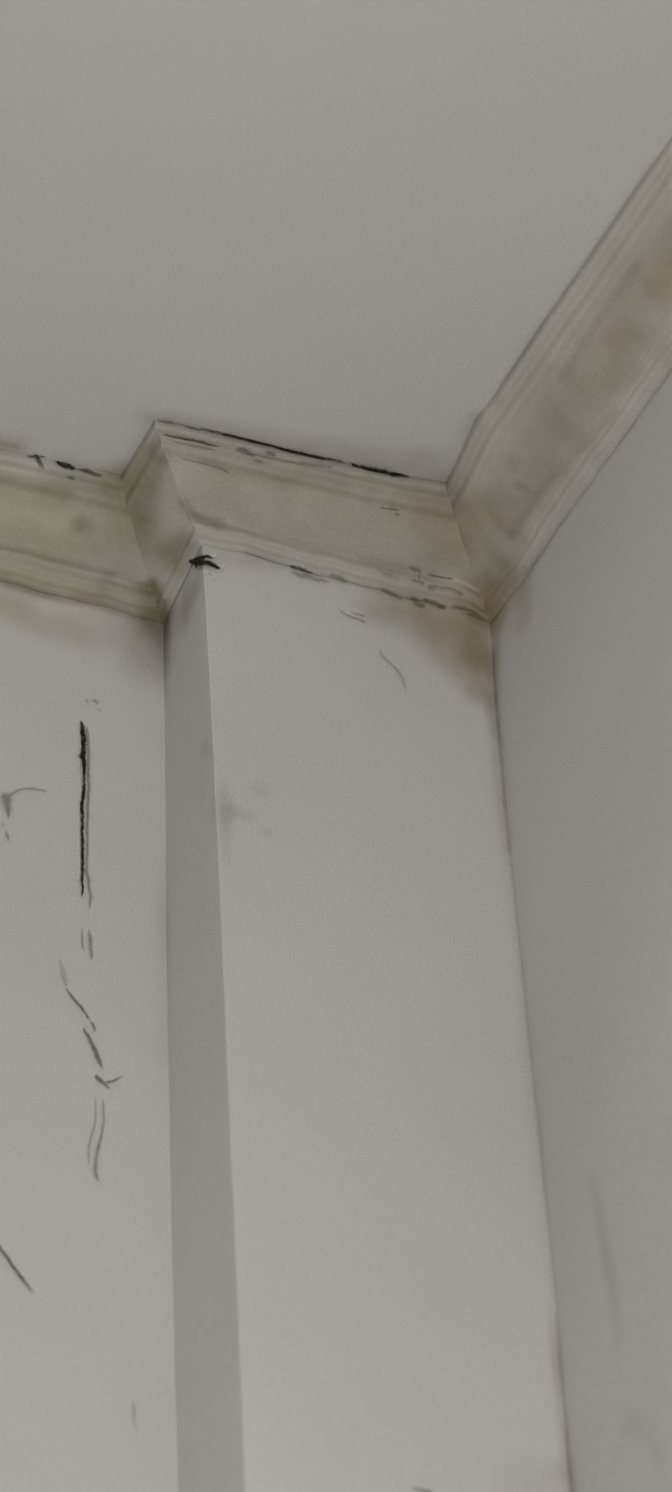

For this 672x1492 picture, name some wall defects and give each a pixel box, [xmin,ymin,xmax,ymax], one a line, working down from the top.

crack [168,422,408,477]
crack [77,721,86,895]
crack [69,993,117,1083]
crack [0,1247,33,1292]